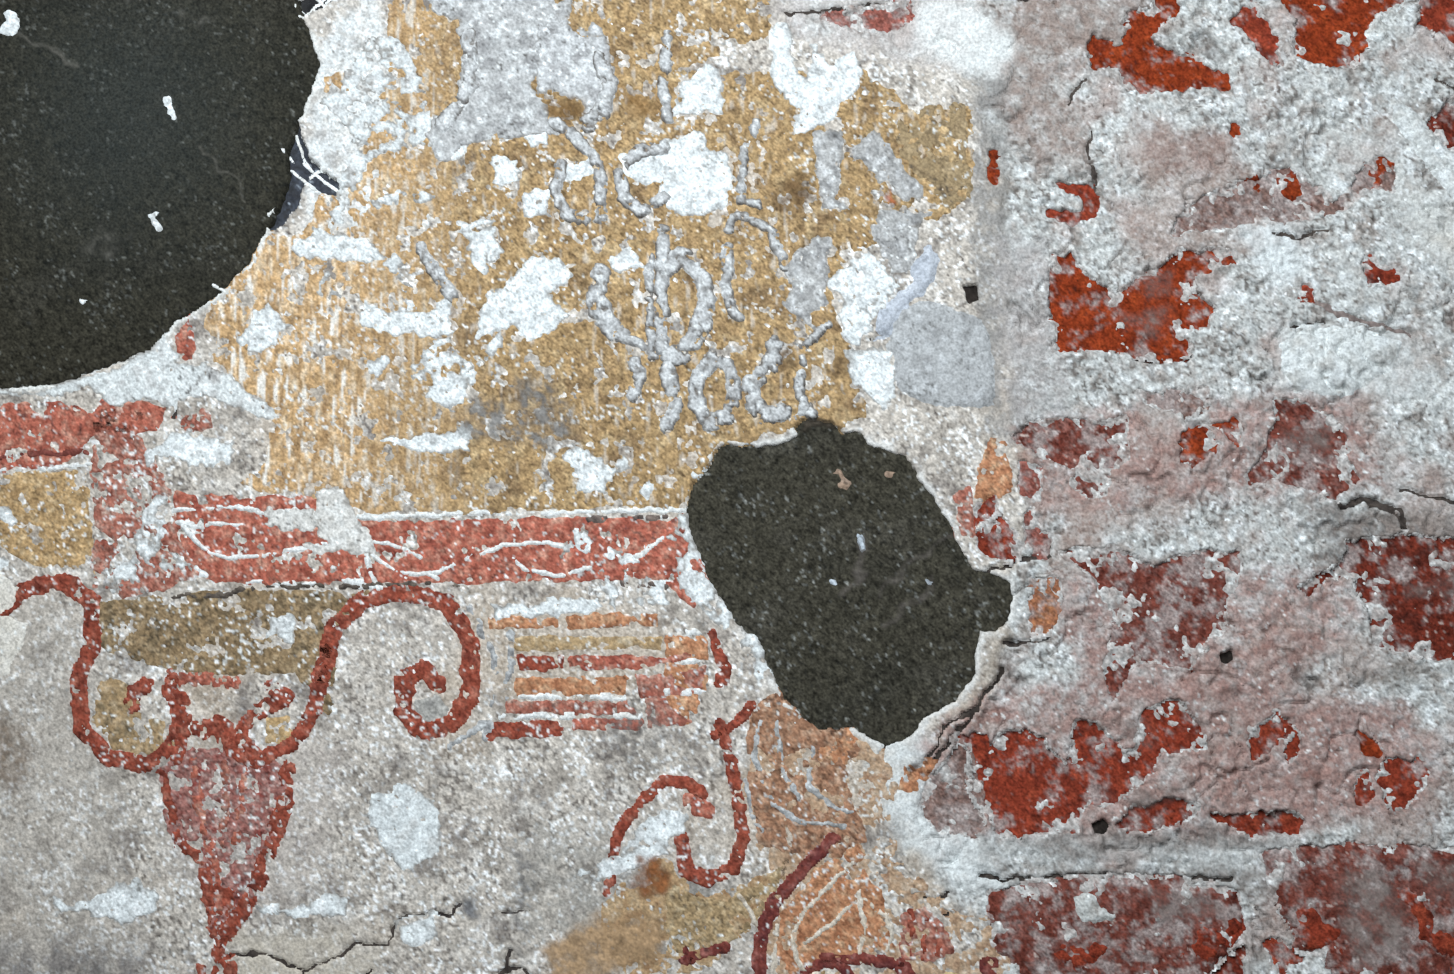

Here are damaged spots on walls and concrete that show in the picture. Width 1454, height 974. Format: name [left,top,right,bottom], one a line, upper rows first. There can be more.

spalling [1087,0,1231,94]
spalling [1230,0,1454,70]
peeling [267,0,615,457]
peeling [769,22,933,411]
spalling [1045,156,1407,364]
spalling [973,414,1244,701]
spalling [1297,529,1454,663]
crack [1337,489,1454,530]
flaking render [920,699,1454,974]
crack [231,903,462,974]
crack [498,949,529,974]
crack [501,908,530,916]